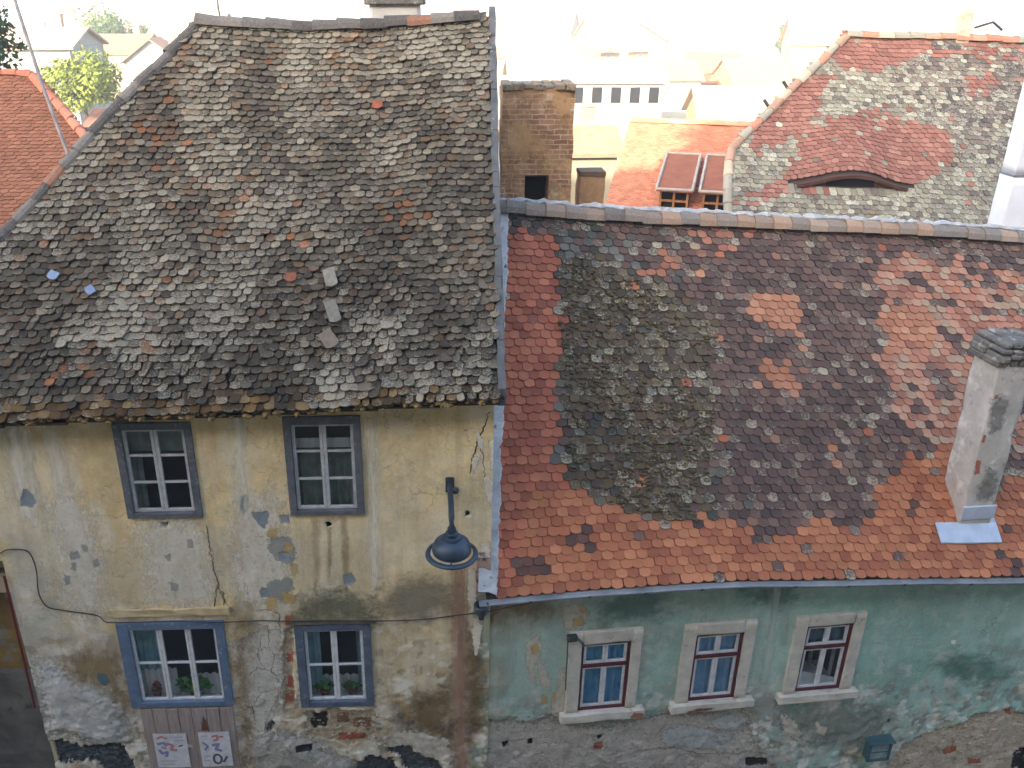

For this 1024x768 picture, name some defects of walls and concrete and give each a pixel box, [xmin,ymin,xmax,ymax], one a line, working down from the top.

peeling [20,477,109,621]
crack [206,526,226,607]
peeling [240,496,297,611]
damp [225,418,451,625]
crack [470,412,494,506]
crack [250,609,281,729]
peeling [233,626,454,768]
flaking render [487,633,777,768]